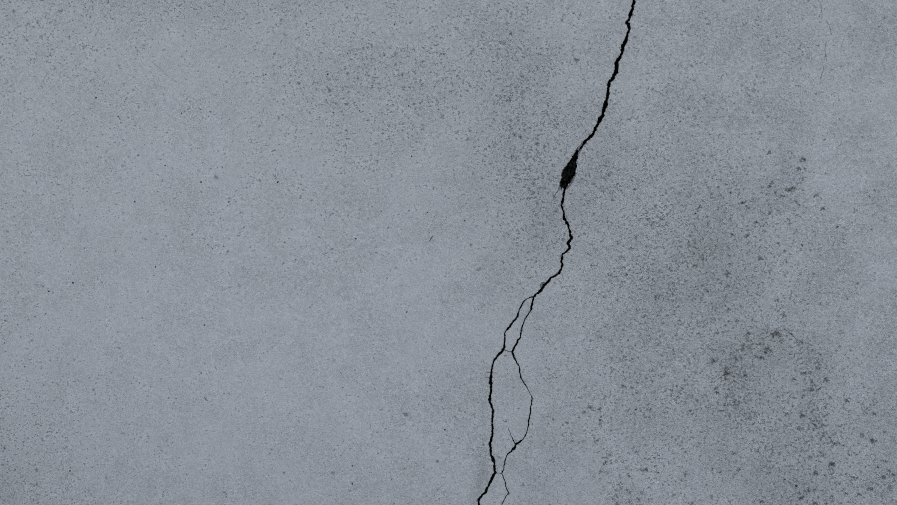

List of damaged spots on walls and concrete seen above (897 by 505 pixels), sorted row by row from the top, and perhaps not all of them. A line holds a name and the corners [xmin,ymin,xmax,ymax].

crack [575,0,636,154]
crack [476,188,574,505]